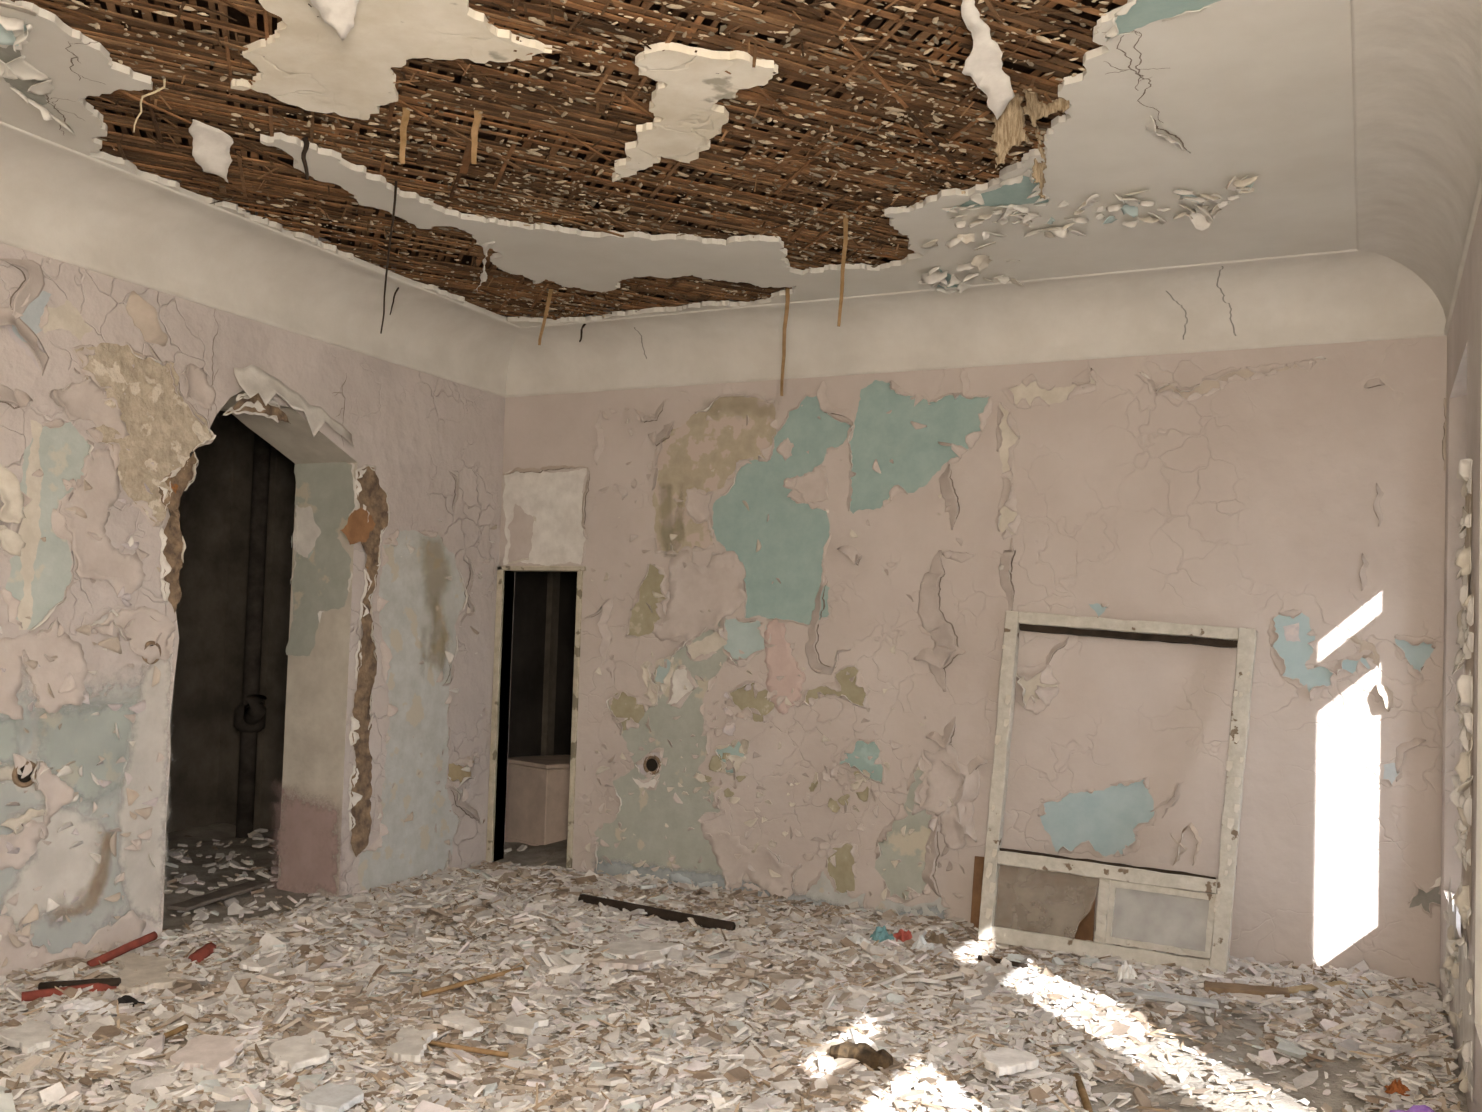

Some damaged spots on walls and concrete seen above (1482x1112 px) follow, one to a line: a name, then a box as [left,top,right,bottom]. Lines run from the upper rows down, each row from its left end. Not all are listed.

crack [1102,30,1191,154]
flaking render [0,0,1260,320]
peeling [9,284,52,353]
crack [1166,291,1188,340]
crack [1216,266,1237,336]
peeling [0,342,536,968]
peeling [580,380,1020,919]
peeling [1015,662,1060,715]
peeling [1267,609,1381,701]
peeling [1393,634,1436,681]
peeling [1038,777,1157,858]
peeling [1408,458,1475,1112]